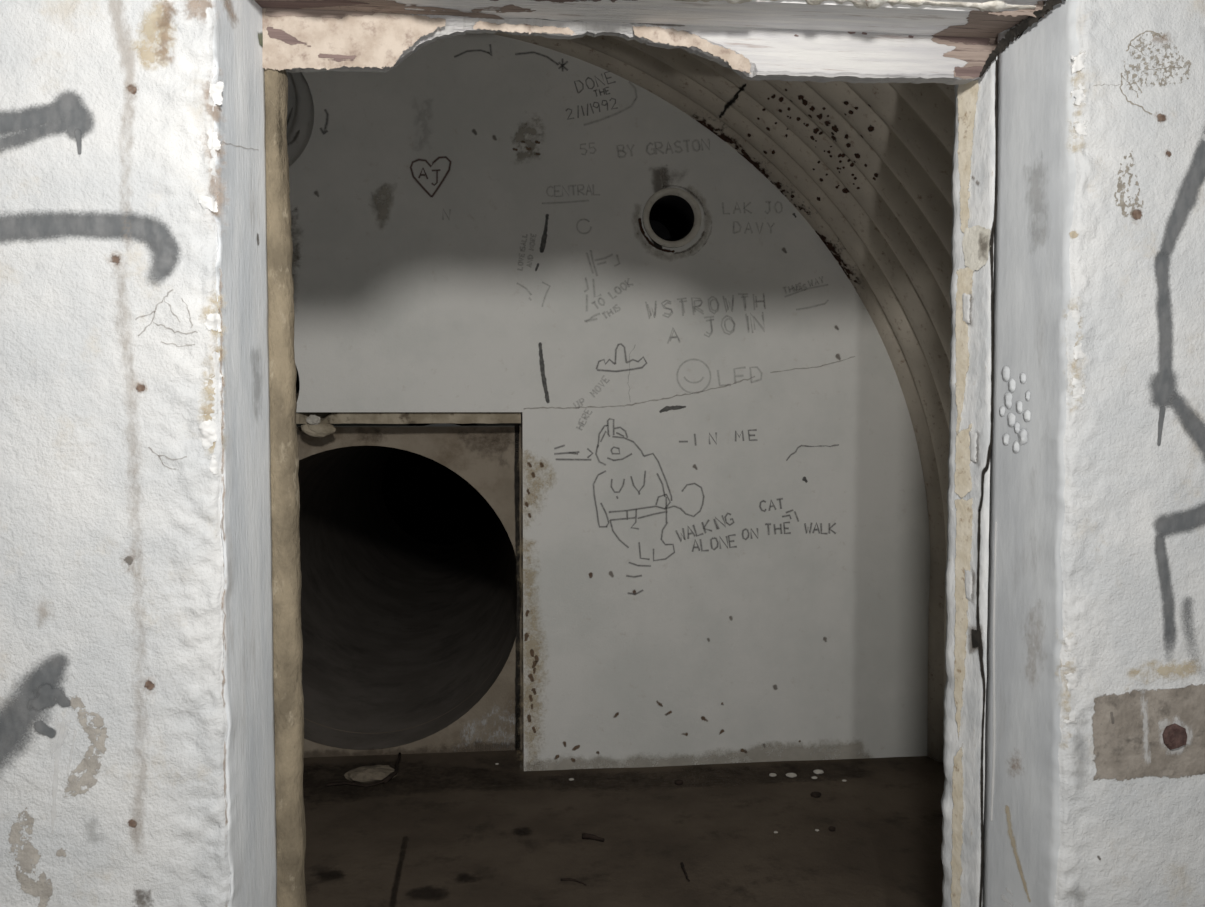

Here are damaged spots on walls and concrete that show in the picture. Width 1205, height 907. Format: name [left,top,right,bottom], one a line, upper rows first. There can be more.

peeling [254,0,637,71]
spalling [633,26,751,74]
corrosion [693,115,820,215]
corrosion [757,89,878,193]
corrosion [815,231,860,288]
corrosion [524,456,551,518]
corrosion [524,543,541,741]
flaking render [51,695,108,797]
corrosion [1160,718,1192,752]
flaking render [8,808,53,907]